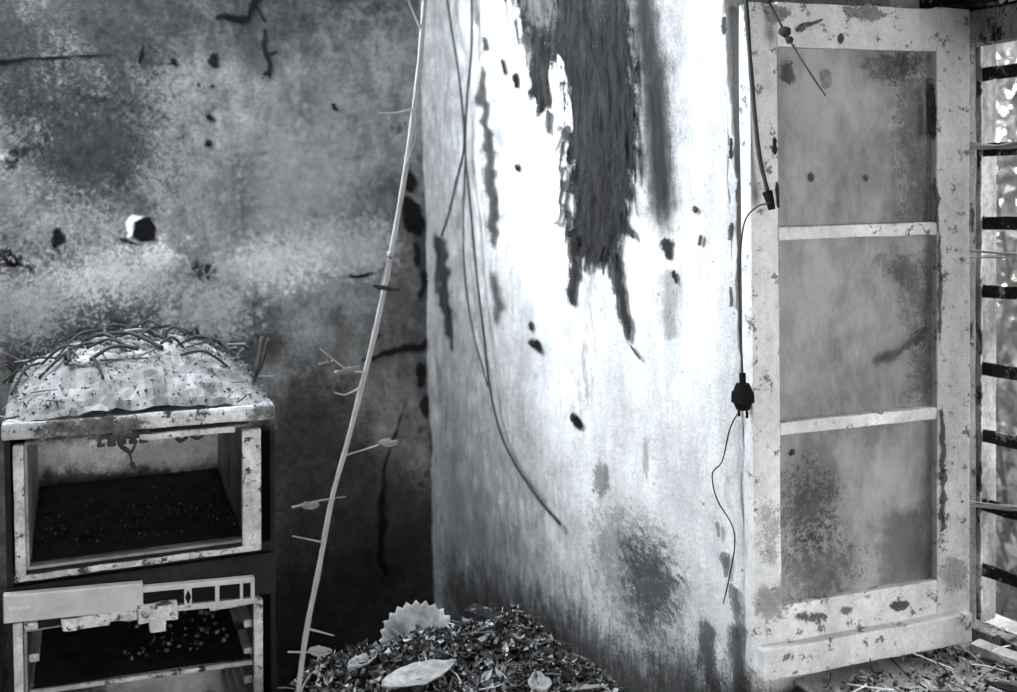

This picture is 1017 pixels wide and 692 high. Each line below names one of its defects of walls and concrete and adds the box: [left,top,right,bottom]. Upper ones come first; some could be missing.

peeling [763,5,791,25]
peeling [795,19,823,32]
crack [0,54,111,65]
water stain [0,33,452,368]
flaking render [715,0,740,387]
flaking render [119,214,156,246]
water stain [415,362,430,418]
crack [376,404,406,576]
flaking render [719,552,744,642]